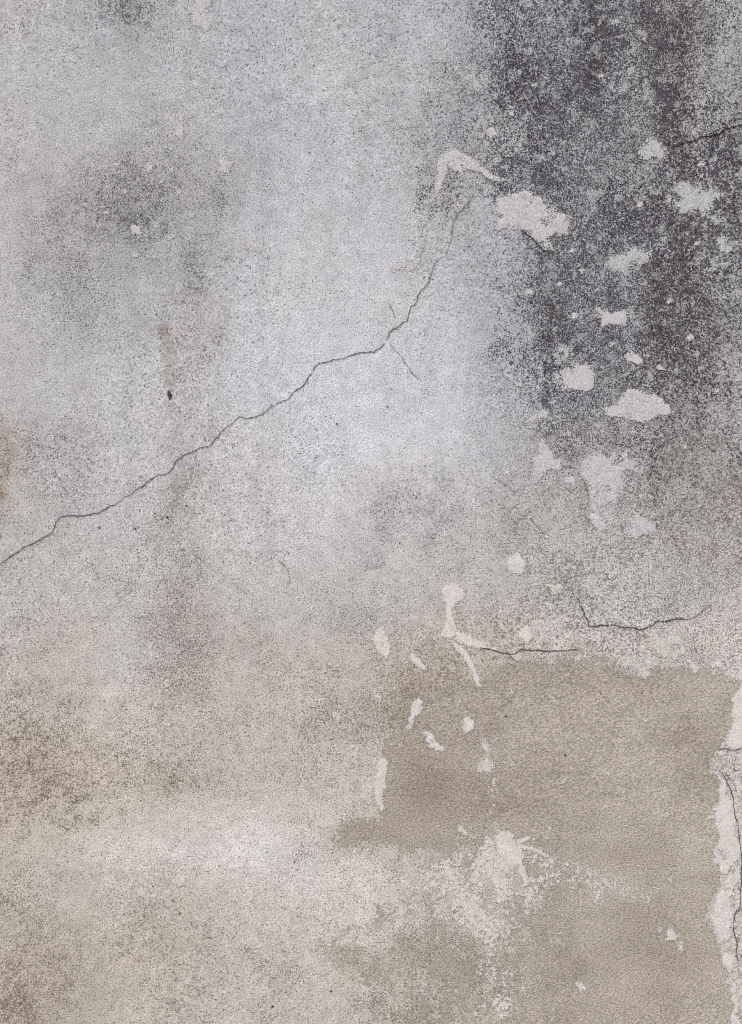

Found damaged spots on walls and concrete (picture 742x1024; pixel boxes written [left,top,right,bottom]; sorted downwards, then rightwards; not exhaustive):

crack [0,256,445,565]
leakage [412,0,742,522]
crack [482,647,578,655]
crack [572,591,688,630]
peeling [315,622,742,1024]